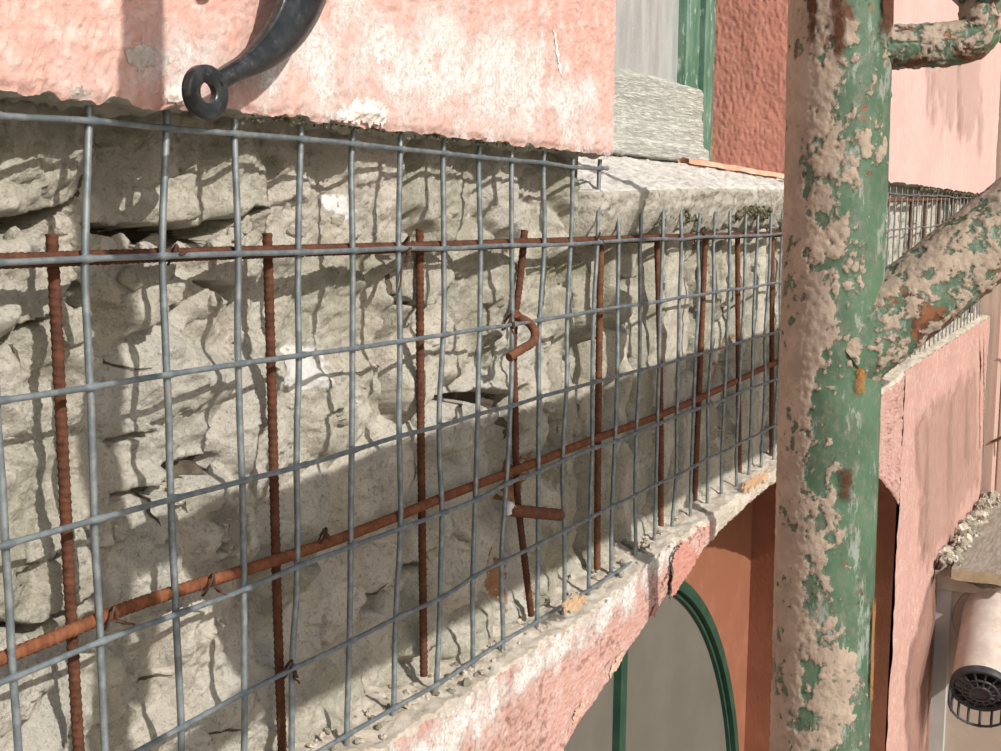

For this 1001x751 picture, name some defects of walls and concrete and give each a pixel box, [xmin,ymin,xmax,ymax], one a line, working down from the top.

corrosion [807,0,816,41]
corrosion [832,0,846,55]
corrosion [881,0,893,32]
crack [69,174,83,199]
crack [90,226,207,245]
spalling [885,183,974,268]
spalling [923,305,976,346]
spalling [0,86,781,751]
corrosion [484,548,508,613]